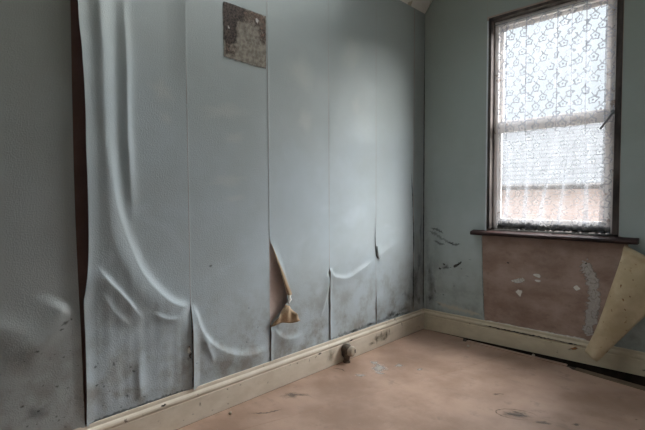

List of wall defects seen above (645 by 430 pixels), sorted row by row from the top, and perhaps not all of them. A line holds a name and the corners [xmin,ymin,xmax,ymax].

peeling [223,2,266,68]
peeling [482,235,629,341]